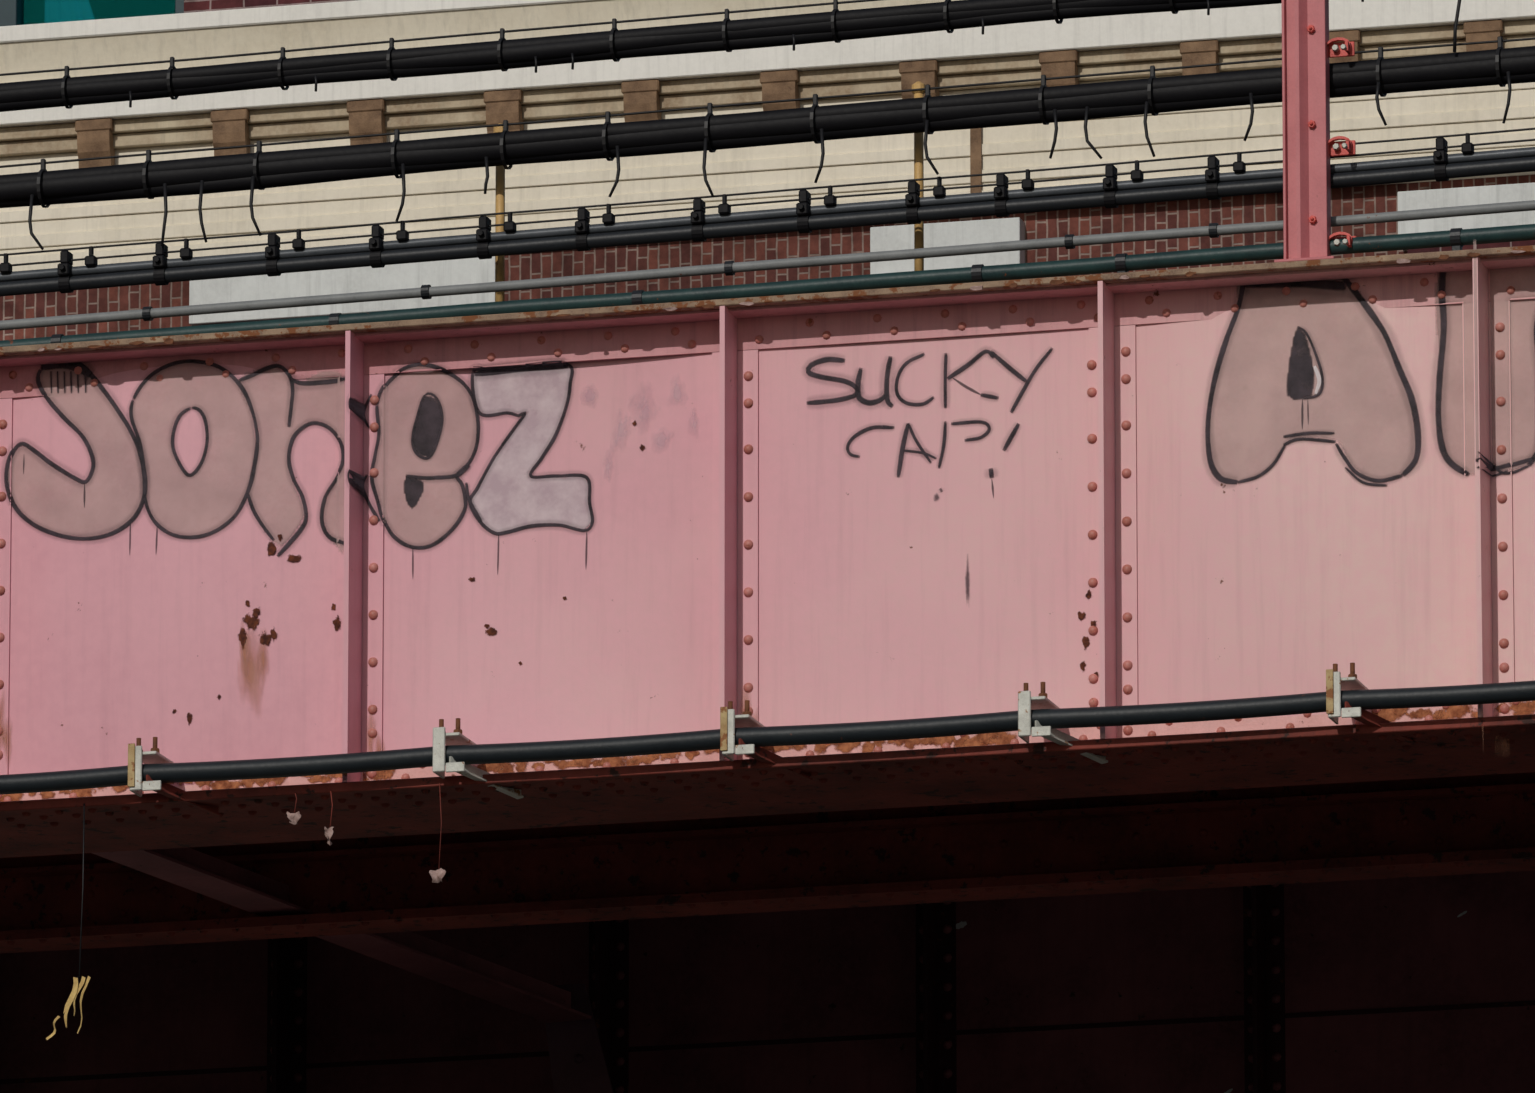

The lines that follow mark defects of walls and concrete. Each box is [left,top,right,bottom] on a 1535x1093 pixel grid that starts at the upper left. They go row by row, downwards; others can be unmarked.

corrosion [238,600,277,685]
corrosion [1078,590,1098,676]
corrosion [1363,701,1535,724]